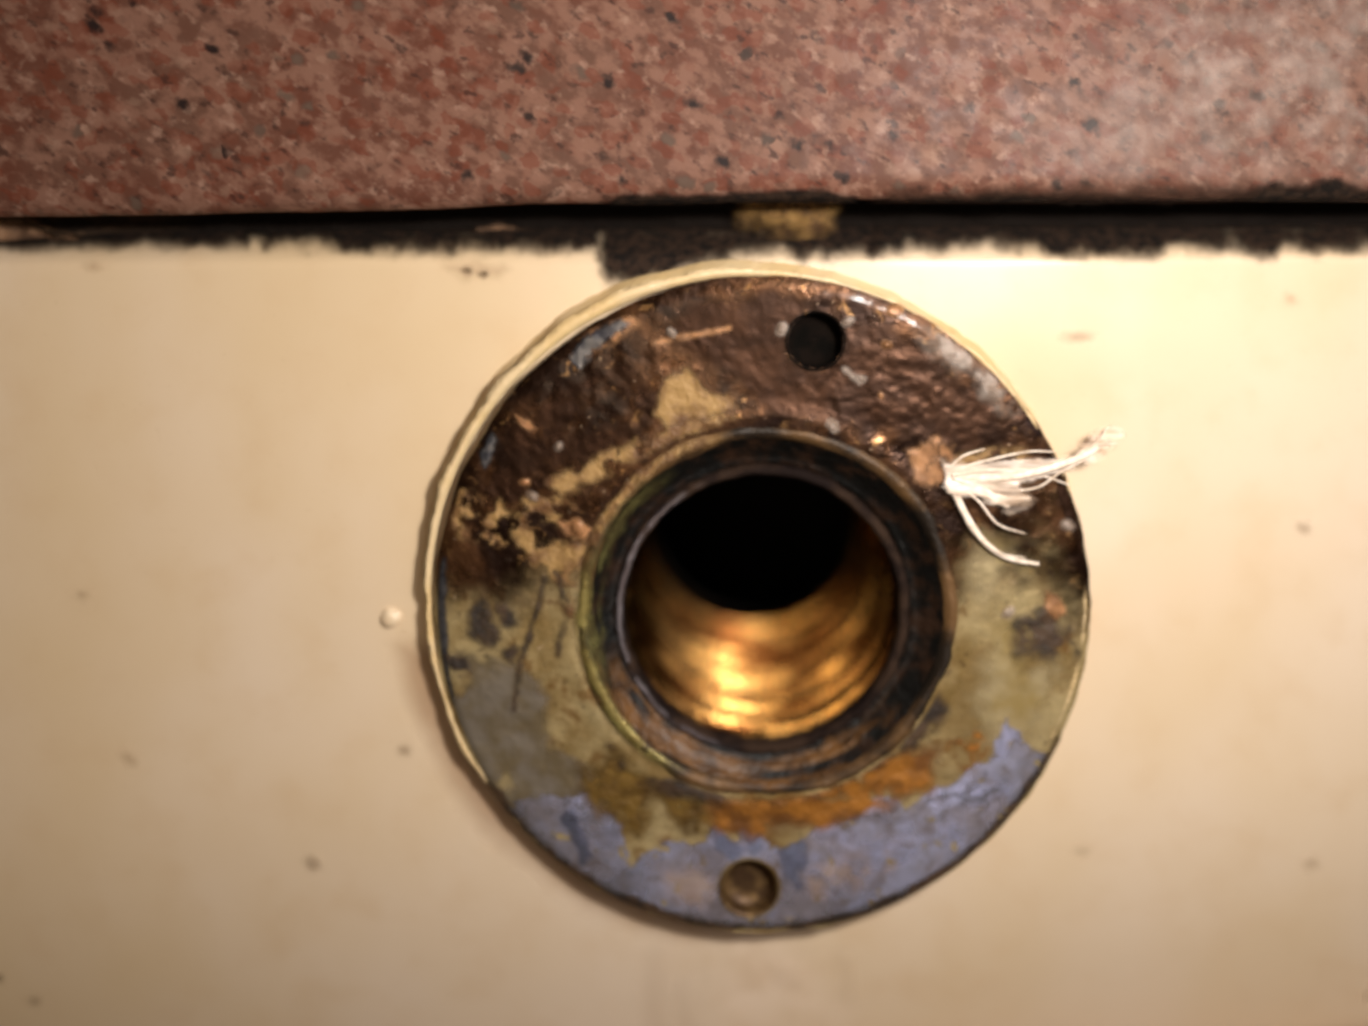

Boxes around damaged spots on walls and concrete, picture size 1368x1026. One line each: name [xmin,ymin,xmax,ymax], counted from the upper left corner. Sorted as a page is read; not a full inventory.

rust [1047,449,1089,591]
rust [487,780,740,930]
rust [582,670,984,837]
rust [787,739,1058,929]